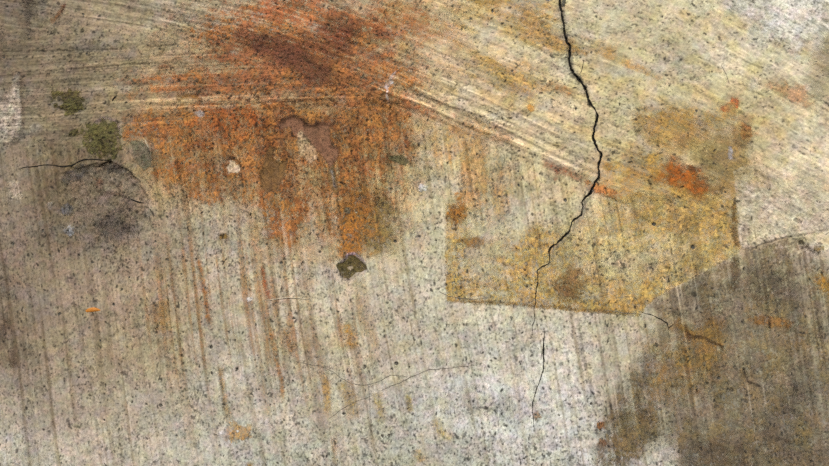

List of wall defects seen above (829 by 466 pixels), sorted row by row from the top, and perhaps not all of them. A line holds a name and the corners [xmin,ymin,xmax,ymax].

corrosion [182,227,210,347]
corrosion [239,243,284,394]
corrosion [123,0,438,257]
spalling [336,252,367,280]
crack [530,0,603,430]
water stain [433,124,829,466]
corrosion [634,98,752,199]